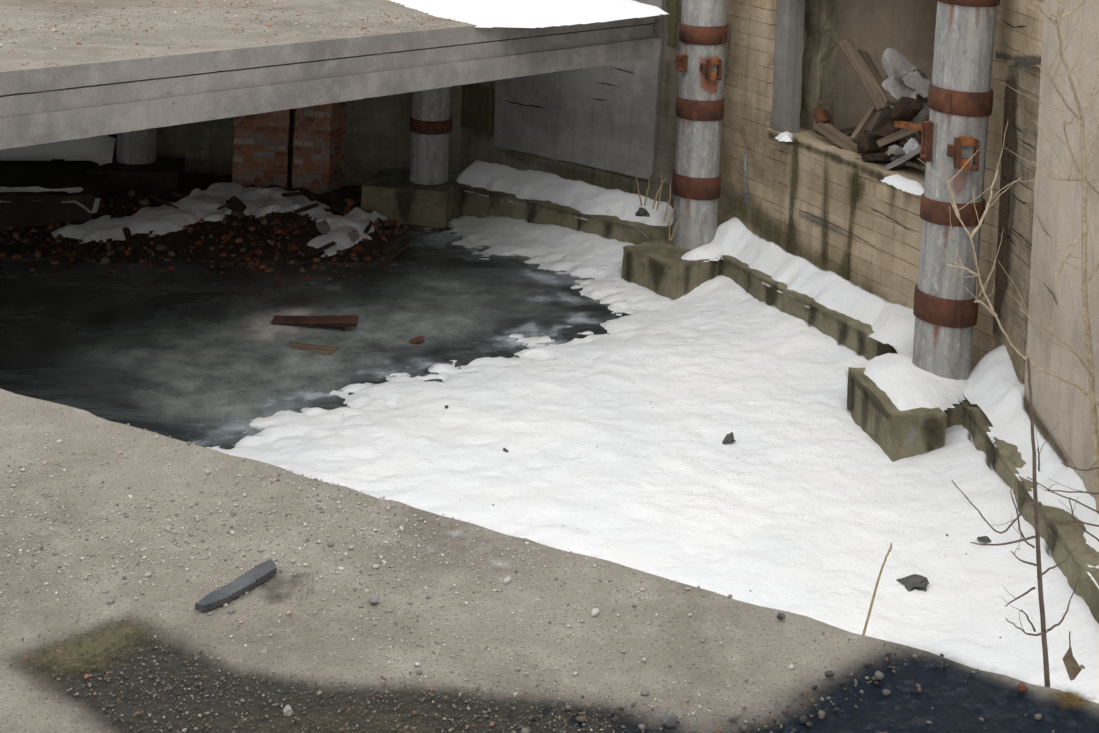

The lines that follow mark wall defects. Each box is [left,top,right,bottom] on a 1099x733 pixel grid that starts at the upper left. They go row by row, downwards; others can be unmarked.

rust [701,58,717,93]